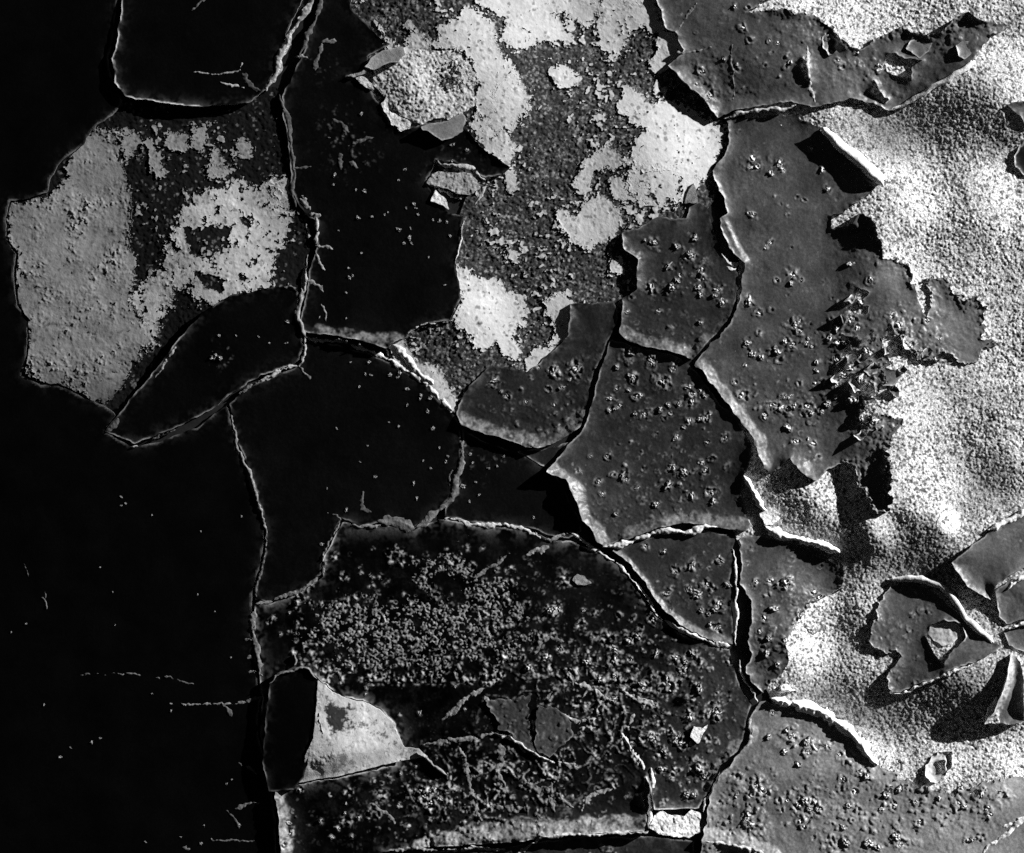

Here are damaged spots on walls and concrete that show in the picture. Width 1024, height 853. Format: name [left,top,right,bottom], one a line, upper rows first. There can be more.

crack [805,46,816,102]
crack [82,0,758,746]
peeling [0,0,751,853]
spalling [445,0,1024,853]
crack [182,801,259,850]
crack [372,677,649,853]
crack [546,668,657,770]
crack [703,773,720,812]
crack [705,841,764,853]